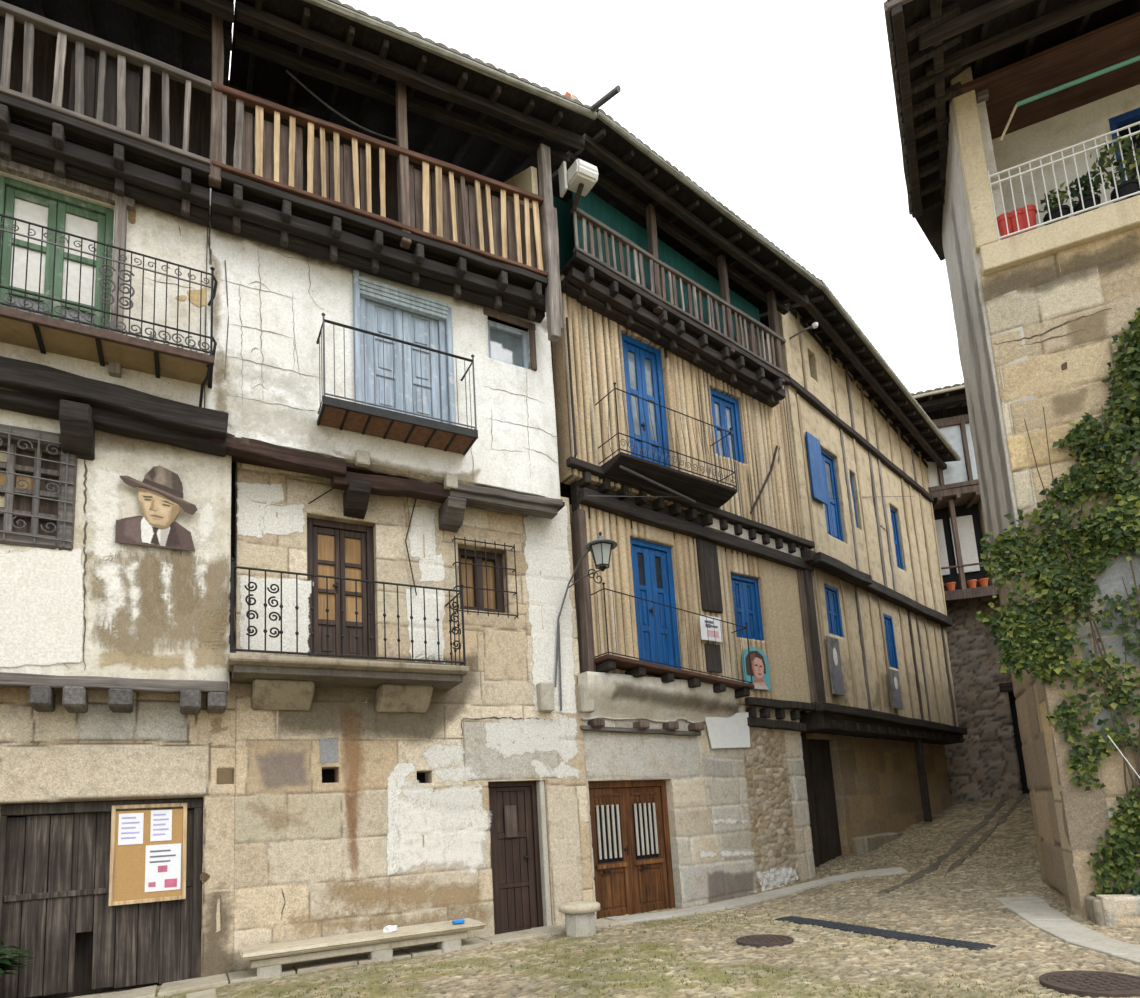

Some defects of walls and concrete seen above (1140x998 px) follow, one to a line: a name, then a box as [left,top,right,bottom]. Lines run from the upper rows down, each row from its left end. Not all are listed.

flaking render [176,287,207,307]
damp [89,549,230,668]
peeling [558,712,578,741]
peeling [530,759,581,780]